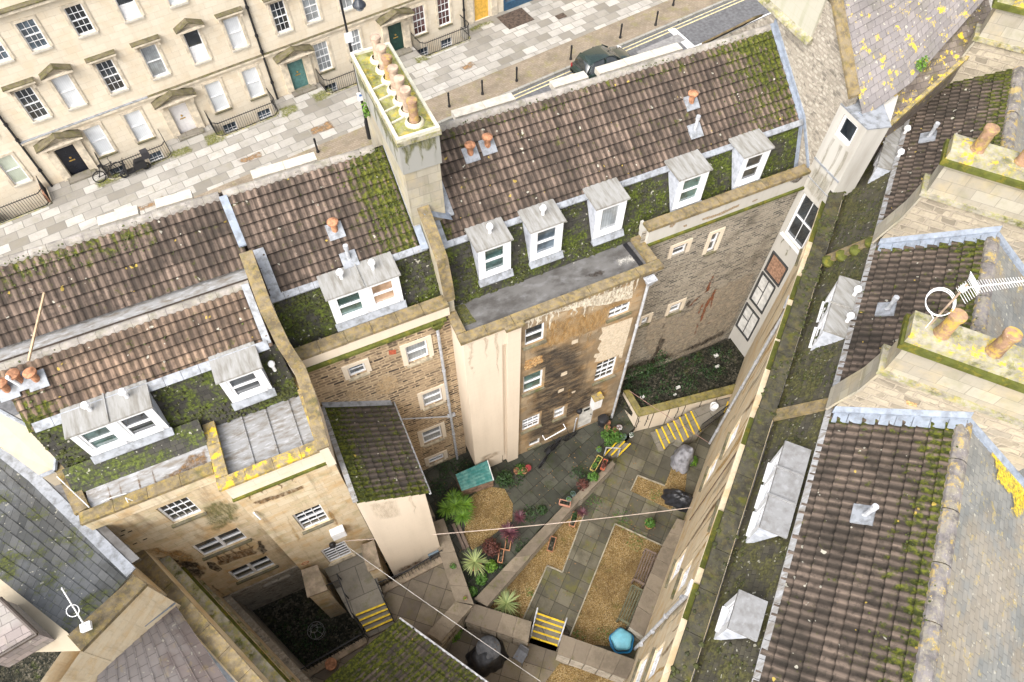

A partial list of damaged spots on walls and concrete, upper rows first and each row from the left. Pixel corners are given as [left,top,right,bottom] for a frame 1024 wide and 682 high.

peeling [525,276,645,328]
rust [688,276,716,333]
water stain [149,541,267,572]